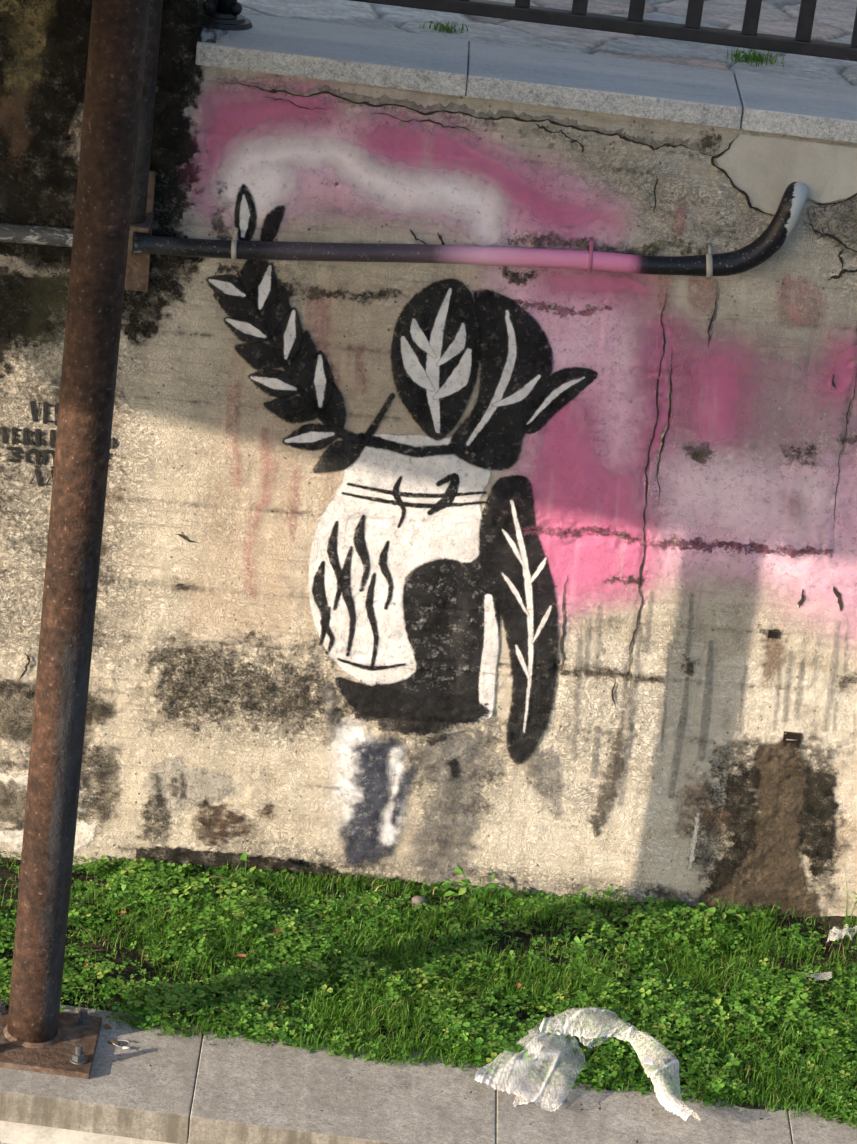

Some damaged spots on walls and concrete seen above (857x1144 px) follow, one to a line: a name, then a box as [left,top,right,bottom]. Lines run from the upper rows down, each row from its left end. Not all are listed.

damp [0,0,93,229]
damp [149,0,227,238]
crack [217,76,774,216]
damp [121,254,205,346]
crack [410,229,445,245]
crack [803,193,857,281]
crack [611,288,672,708]
crack [832,374,857,540]
damp [146,631,348,742]
damp [74,745,120,852]
damp [135,796,427,887]
damp [669,625,847,918]